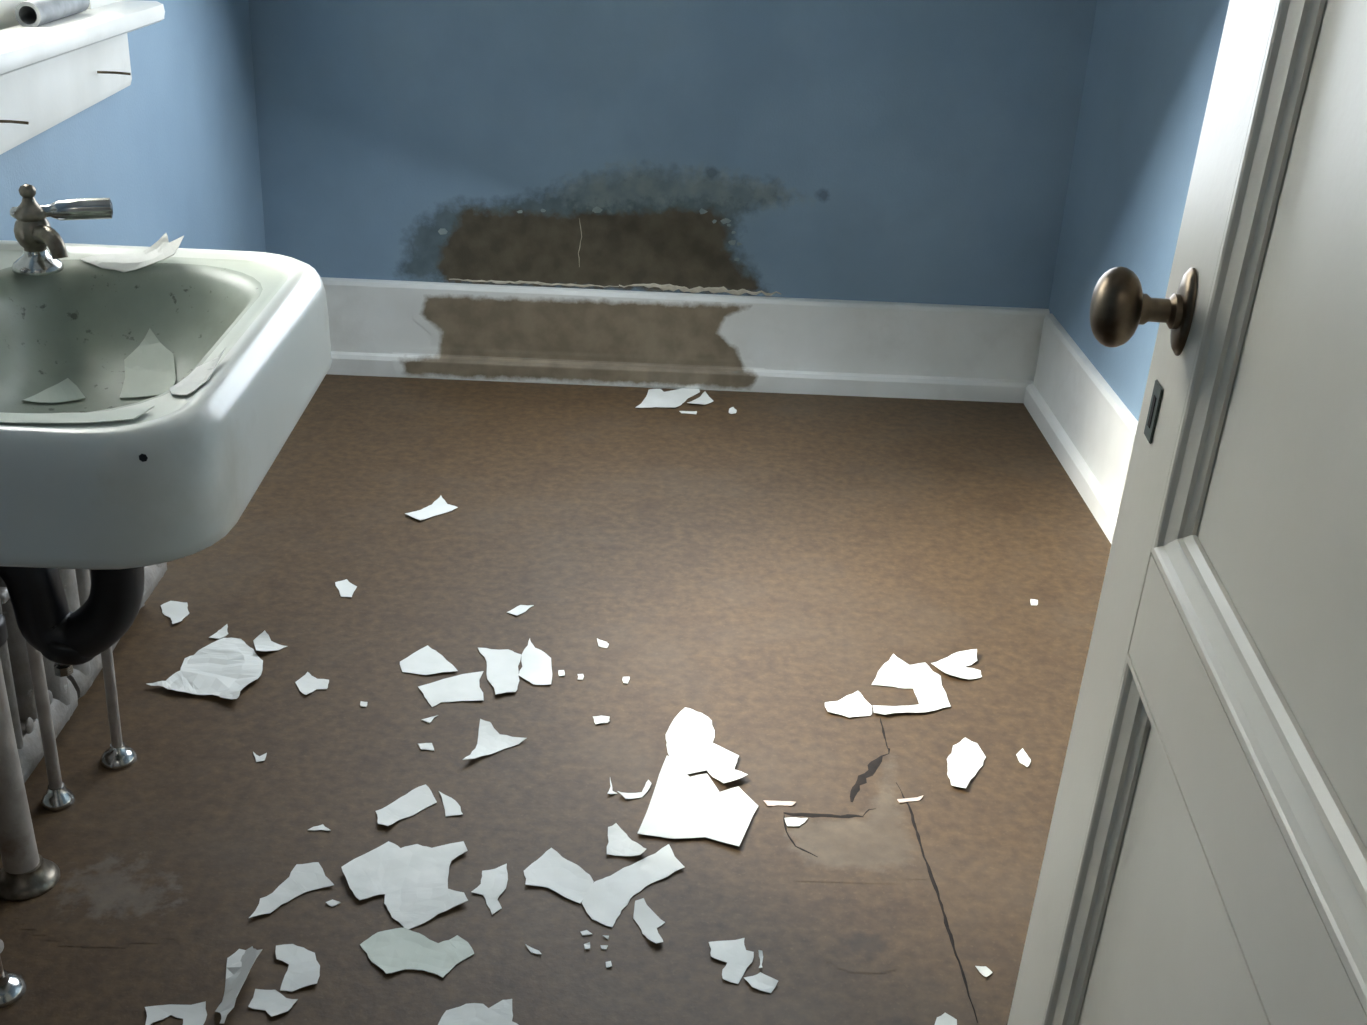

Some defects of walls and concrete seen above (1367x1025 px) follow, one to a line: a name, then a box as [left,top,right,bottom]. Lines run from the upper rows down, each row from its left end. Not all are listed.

peeling [375,144,830,414]
crack [764,718,978,1023]